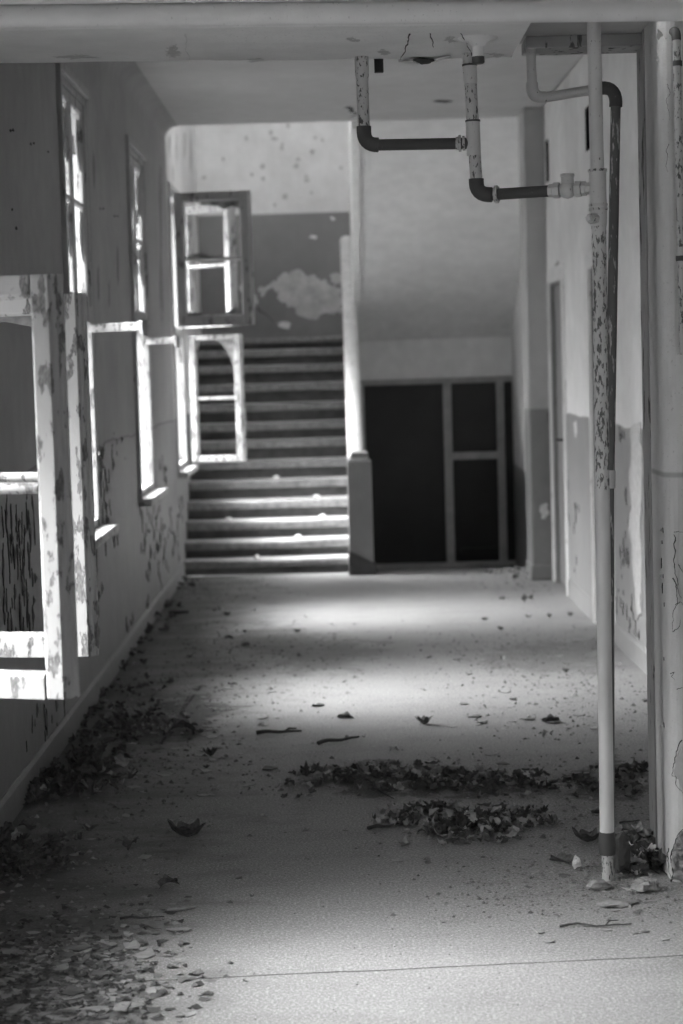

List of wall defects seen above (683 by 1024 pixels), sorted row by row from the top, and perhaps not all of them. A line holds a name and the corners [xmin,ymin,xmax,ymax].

peeling [1,494,38,632]
peeling [140,494,184,589]
peeling [615,422,643,639]
spalling [671,831,683,883]